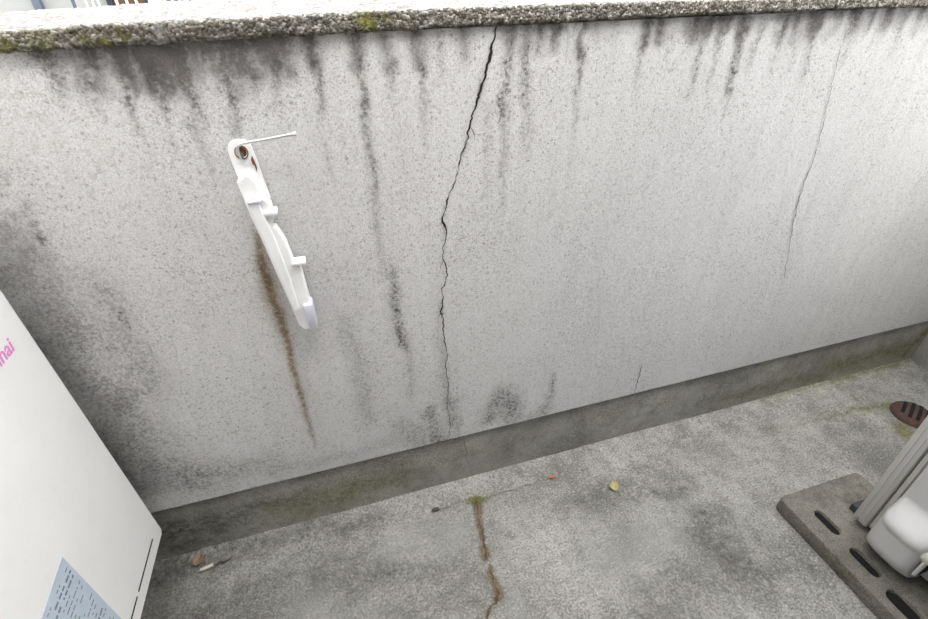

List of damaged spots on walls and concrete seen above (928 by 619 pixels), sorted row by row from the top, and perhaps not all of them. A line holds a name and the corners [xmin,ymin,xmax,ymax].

damp [81,37,288,113]
damp [302,35,324,109]
damp [350,32,377,189]
damp [497,22,586,120]
damp [642,18,666,48]
damp [693,15,749,94]
damp [784,11,825,48]
crack [438,26,497,472]
rust [258,252,307,417]
crack [434,481,540,619]